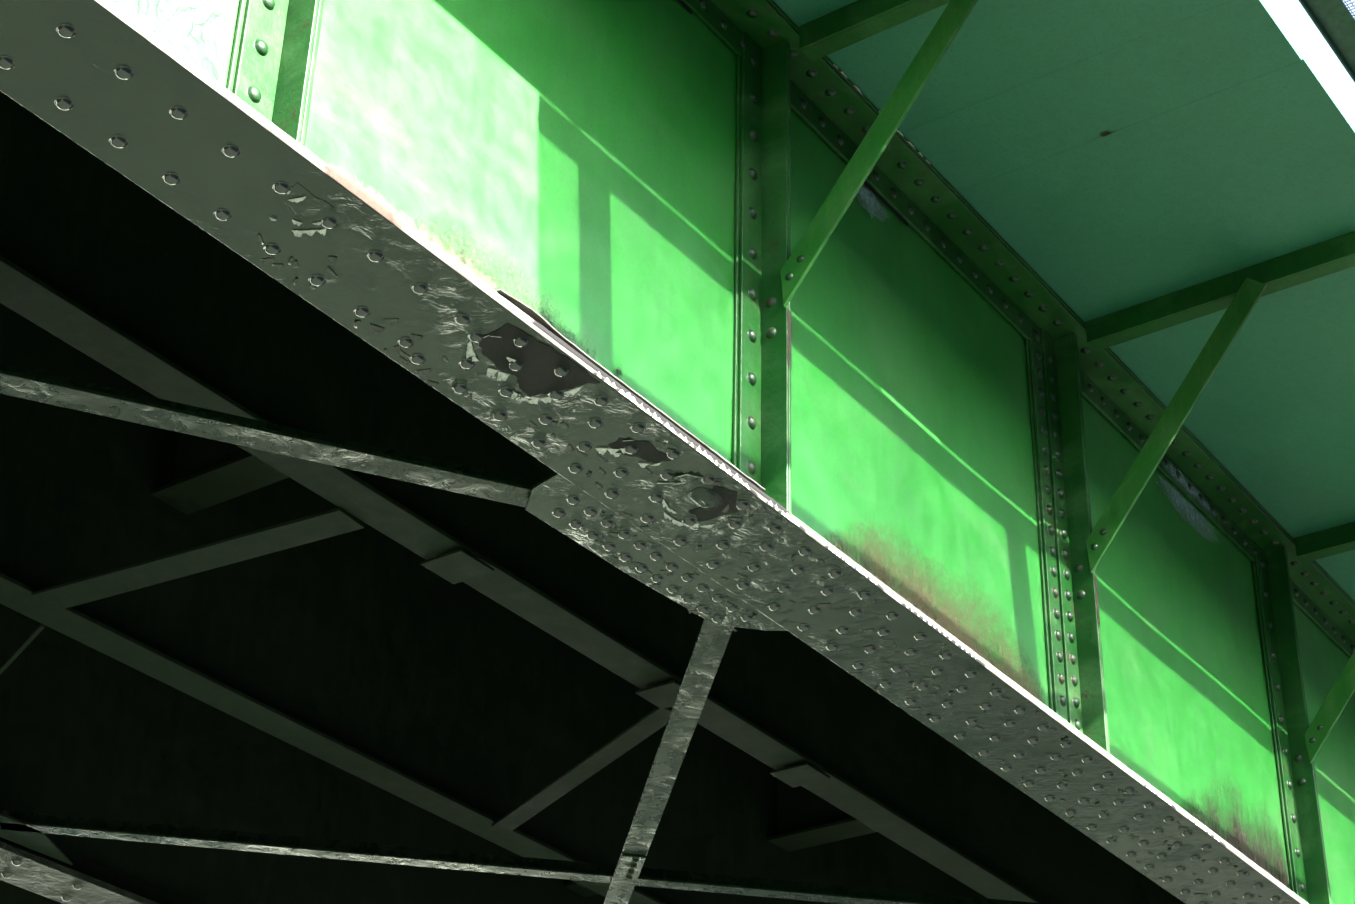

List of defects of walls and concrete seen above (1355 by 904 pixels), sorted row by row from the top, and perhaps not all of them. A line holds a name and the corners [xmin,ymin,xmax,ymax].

peeling [269,183,334,240]
spalling [354,319,806,532]
peeling [820,544,884,604]
rust [1187,798,1290,889]